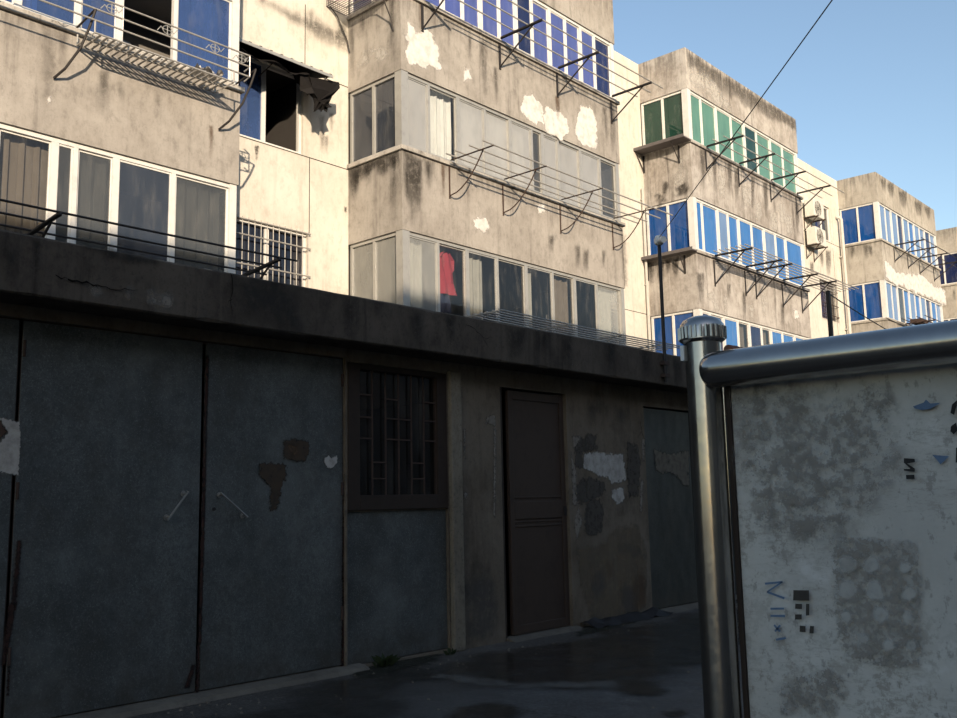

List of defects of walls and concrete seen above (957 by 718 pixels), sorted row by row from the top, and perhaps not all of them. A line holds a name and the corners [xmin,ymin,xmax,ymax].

peeling [405,22,442,70]
peeling [520,95,597,149]
peeling [473,217,490,233]
crack [56,275,129,291]
peeling [575,433,641,536]